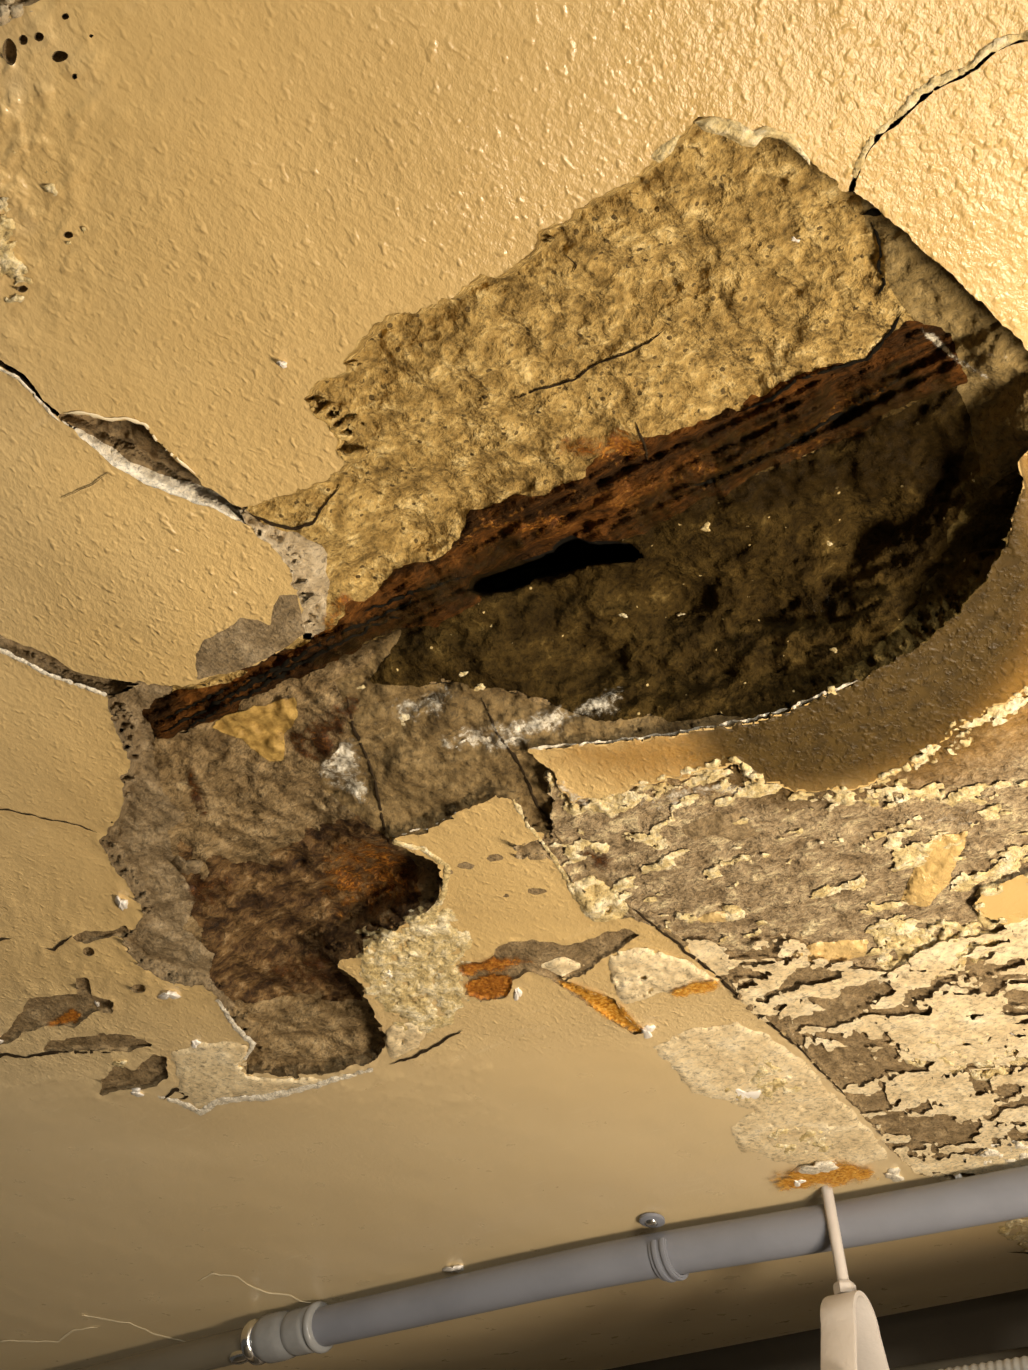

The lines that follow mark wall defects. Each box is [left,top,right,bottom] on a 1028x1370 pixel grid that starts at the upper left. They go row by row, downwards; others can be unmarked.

spalling [52,51,77,80]
crack [848,31,1028,192]
crack [0,360,247,524]
crack [0,635,133,697]
spalling [0,117,1028,1189]
corrosion [458,957,529,1000]
corrosion [559,981,645,1032]
corrosion [770,1161,879,1191]